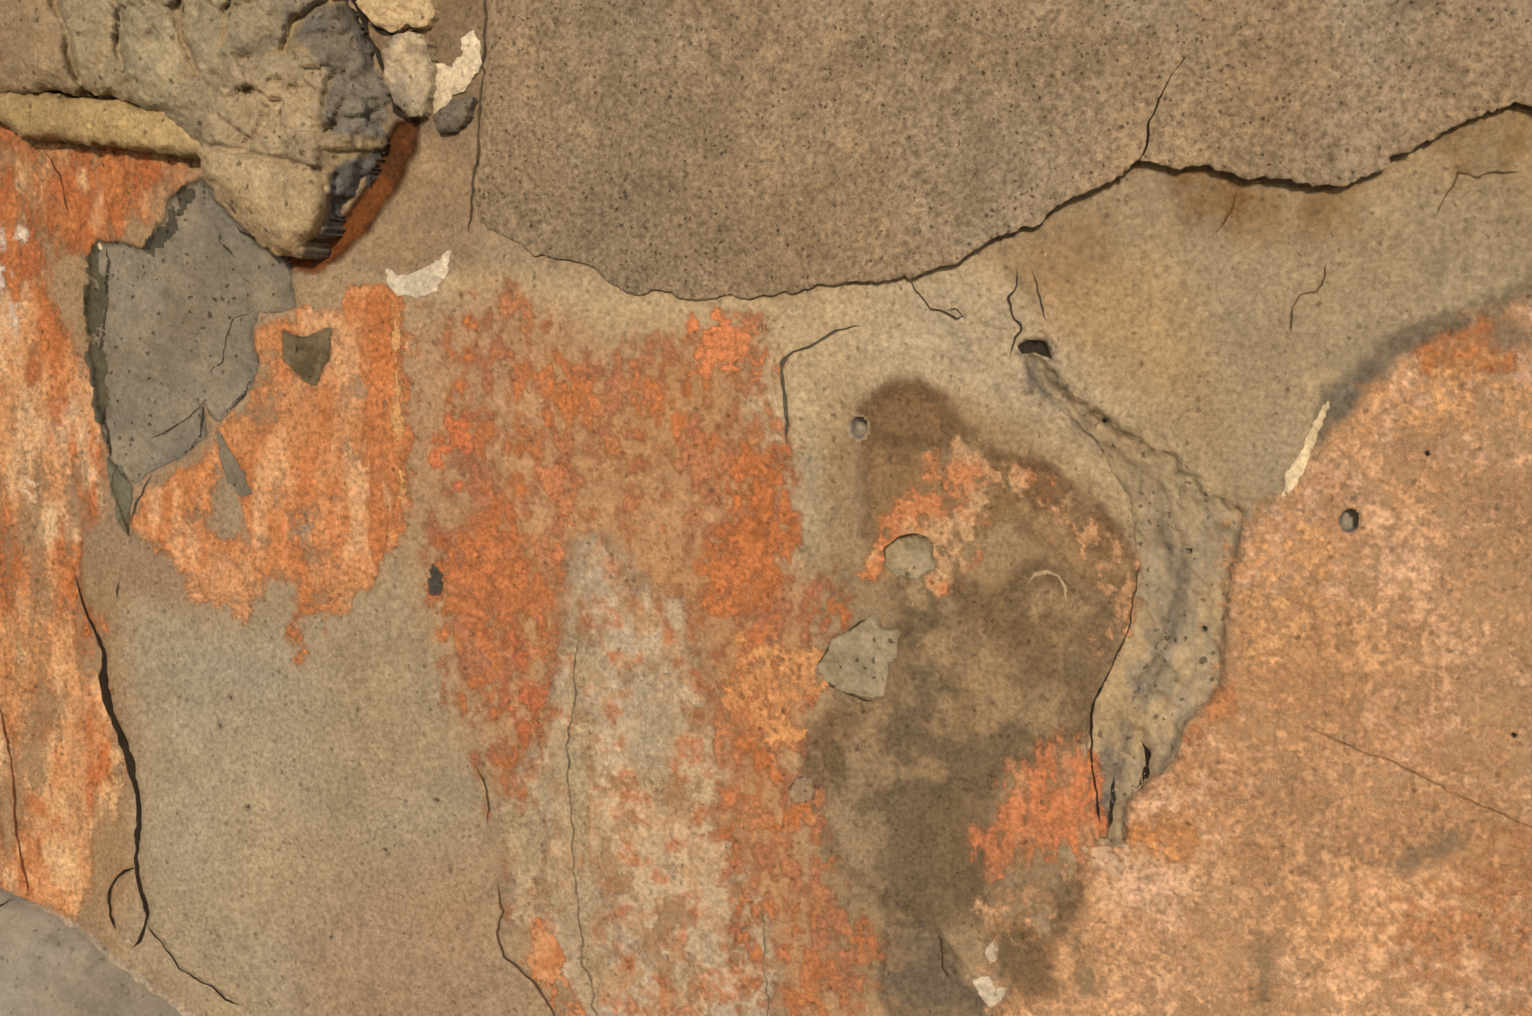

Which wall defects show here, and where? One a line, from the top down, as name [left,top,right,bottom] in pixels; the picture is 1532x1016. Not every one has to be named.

flaking render [355,0,483,134]
crack [0,709,28,906]
crack [110,464,150,536]
crack [73,571,238,1005]
peeling [0,122,901,1016]
damp [801,380,1135,1016]
crack [1090,562,1141,826]
peeling [856,292,1532,1016]